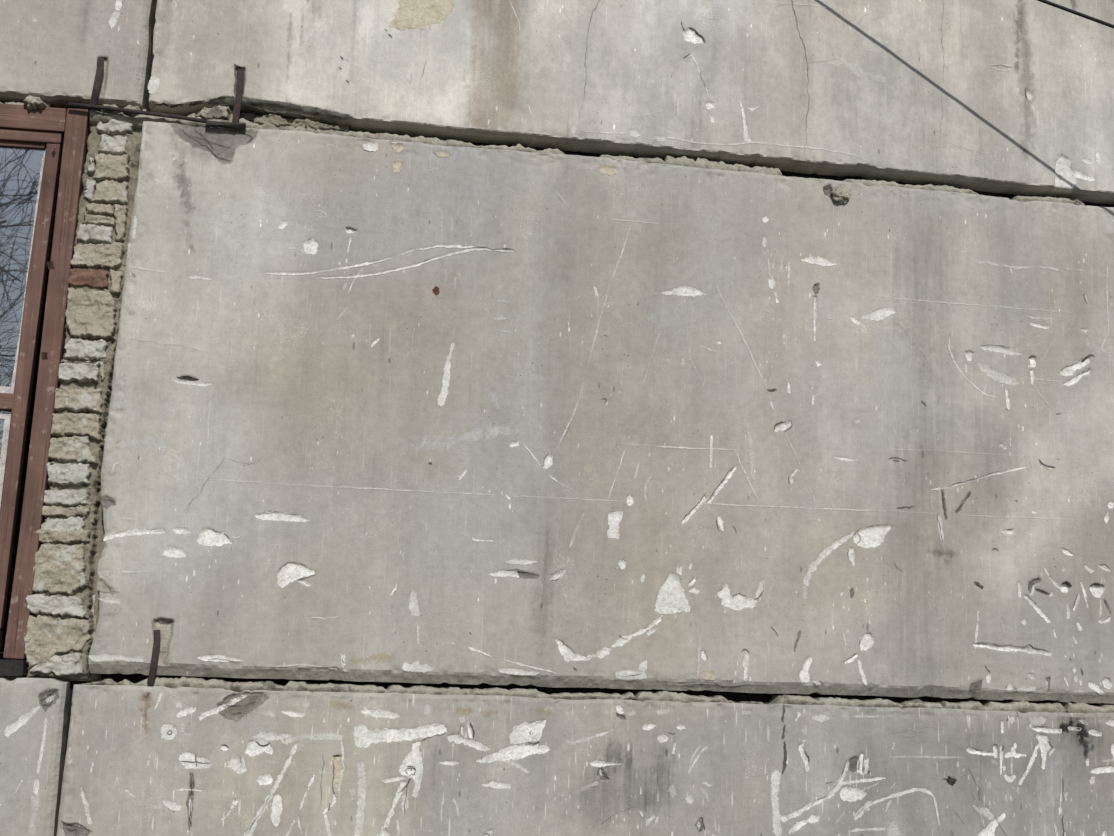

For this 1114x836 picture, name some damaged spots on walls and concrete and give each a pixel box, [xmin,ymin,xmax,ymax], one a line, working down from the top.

peeling [385,0,454,37]
spalling [162,528,240,558]
spalling [277,562,315,588]
spalling [555,563,699,670]
spalling [717,580,764,611]
spalling [803,525,891,586]
spalling [163,752,213,830]
spalling [221,720,550,836]